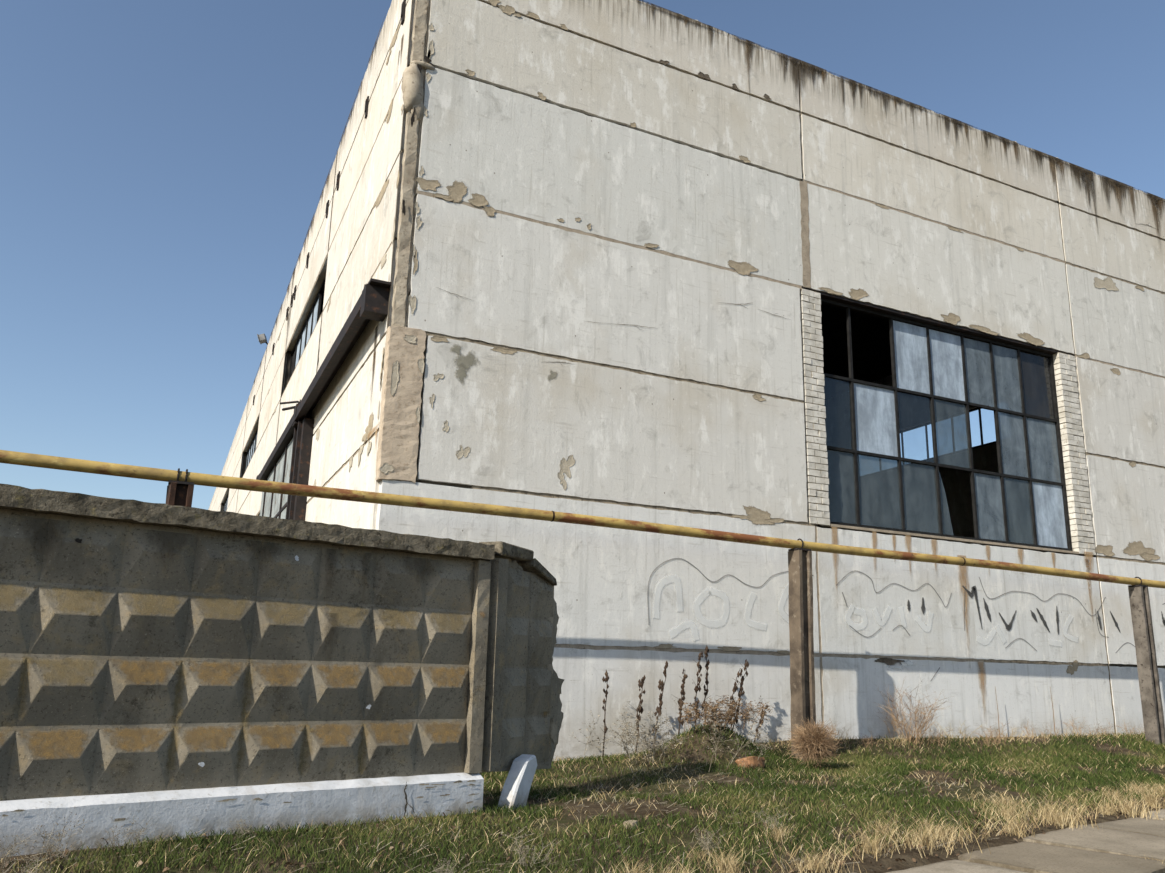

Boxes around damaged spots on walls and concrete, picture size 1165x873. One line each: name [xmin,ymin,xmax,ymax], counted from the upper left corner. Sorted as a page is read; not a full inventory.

spalling [488,0,540,19]
spalling [417,23,434,82]
leakage [320,81,362,198]
leakage [637,0,1165,232]
spalling [373,170,399,208]
spalling [416,166,496,216]
spalling [728,260,758,275]
leakage [252,215,314,386]
spalling [349,406,379,471]
spalling [557,455,575,490]
spalling [731,506,784,525]
spalling [1095,541,1160,562]